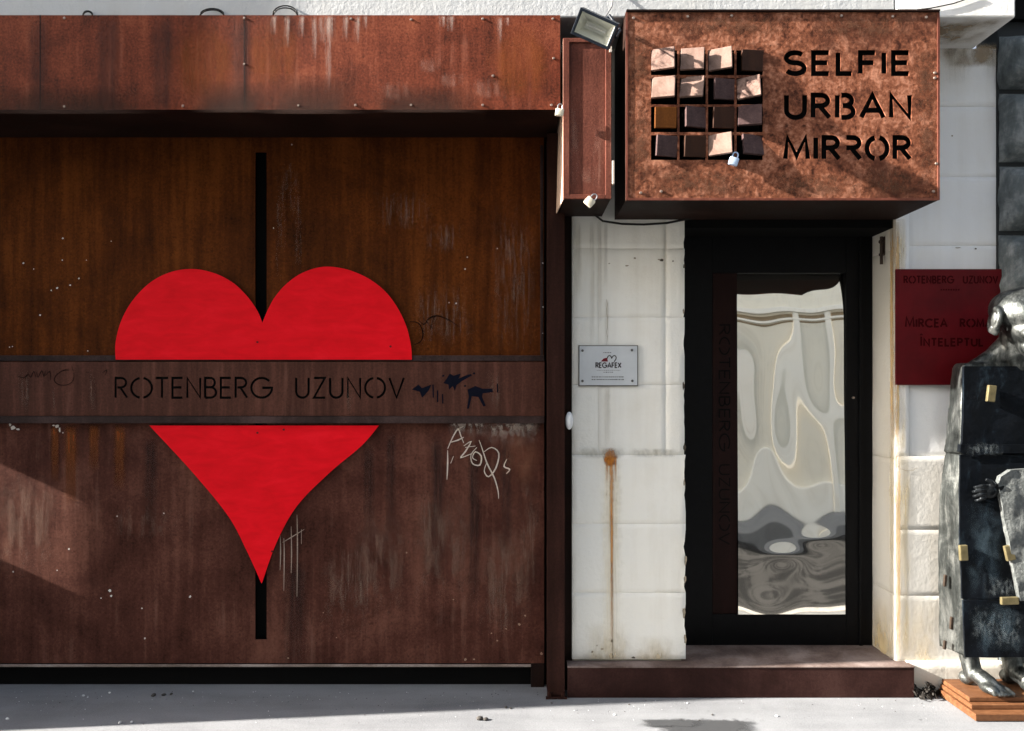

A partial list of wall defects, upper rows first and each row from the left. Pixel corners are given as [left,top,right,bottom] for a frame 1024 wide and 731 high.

corrosion [604,449,616,609]